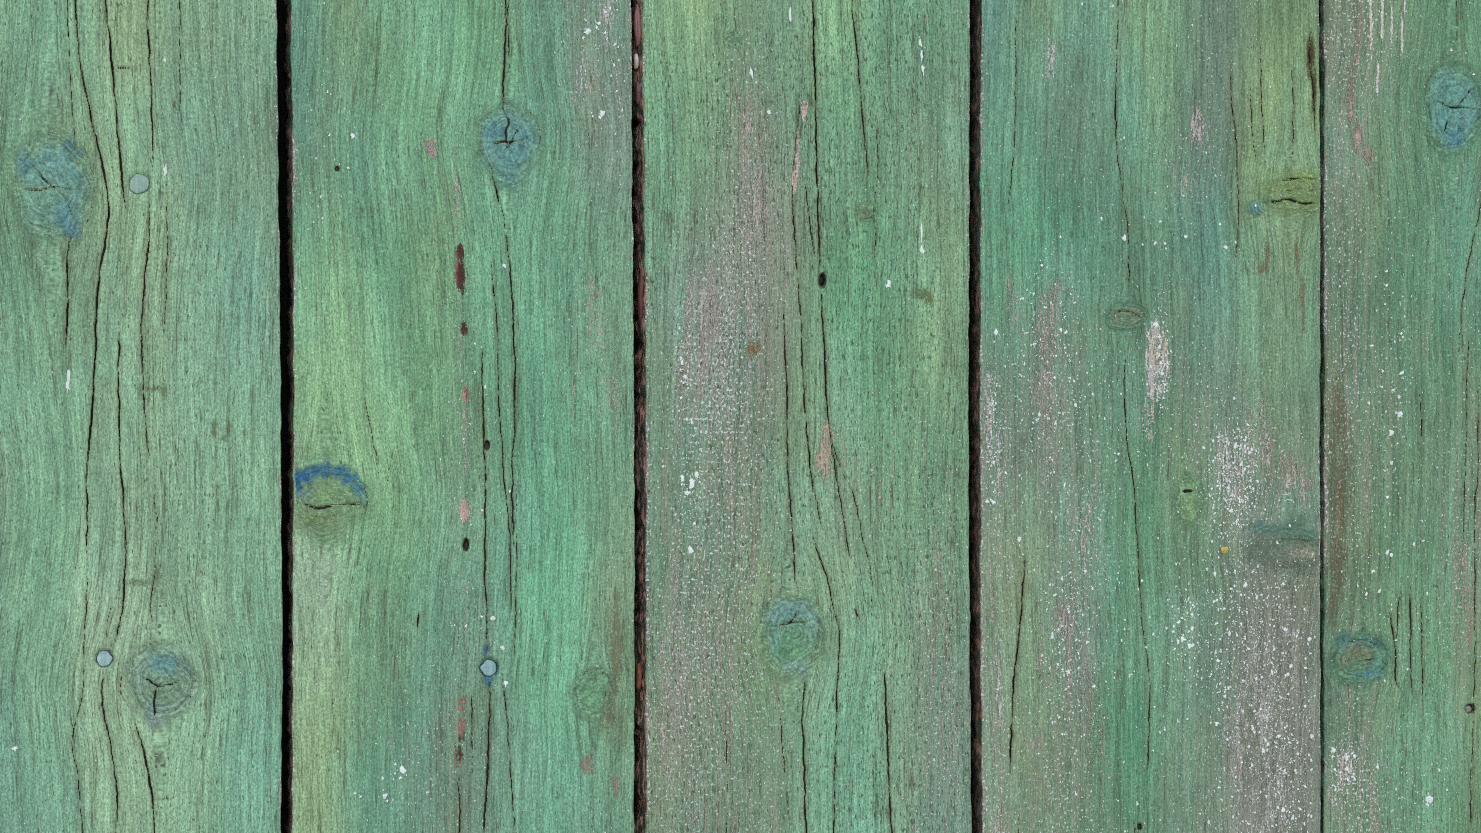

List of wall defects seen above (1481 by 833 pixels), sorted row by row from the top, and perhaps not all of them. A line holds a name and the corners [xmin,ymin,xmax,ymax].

crack [22,0,191,833]
crack [457,0,541,832]
crack [772,2,873,833]
crack [851,9,878,257]